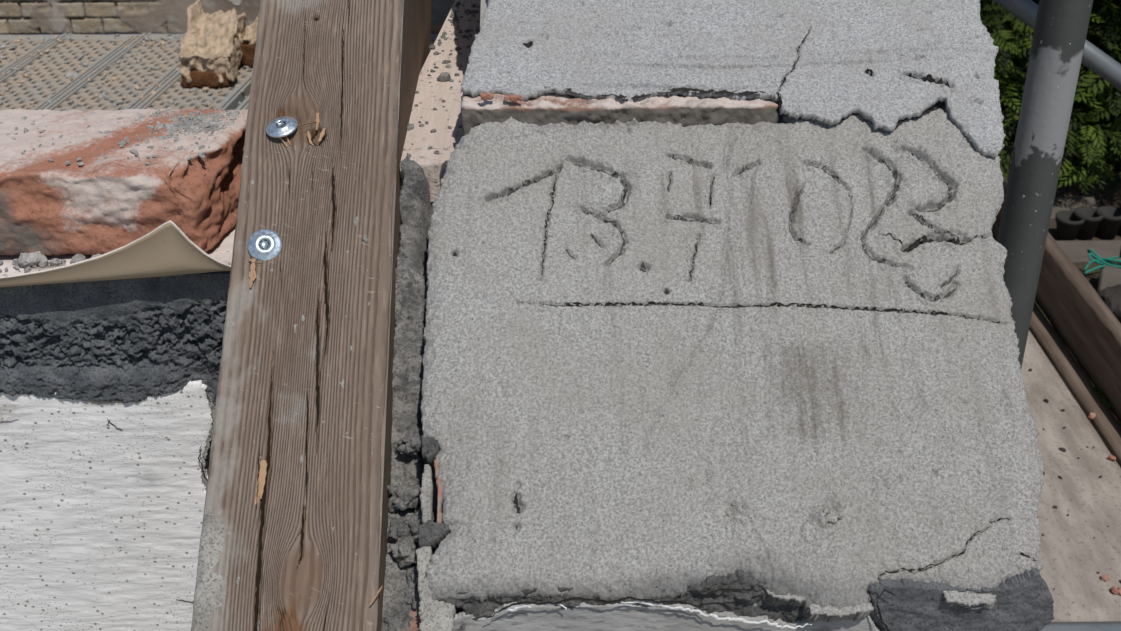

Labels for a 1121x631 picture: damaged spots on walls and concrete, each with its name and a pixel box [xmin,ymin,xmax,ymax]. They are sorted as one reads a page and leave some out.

crack [544,32,942,129]
spalling [416,436,1054,631]
crack [873,518,1013,631]